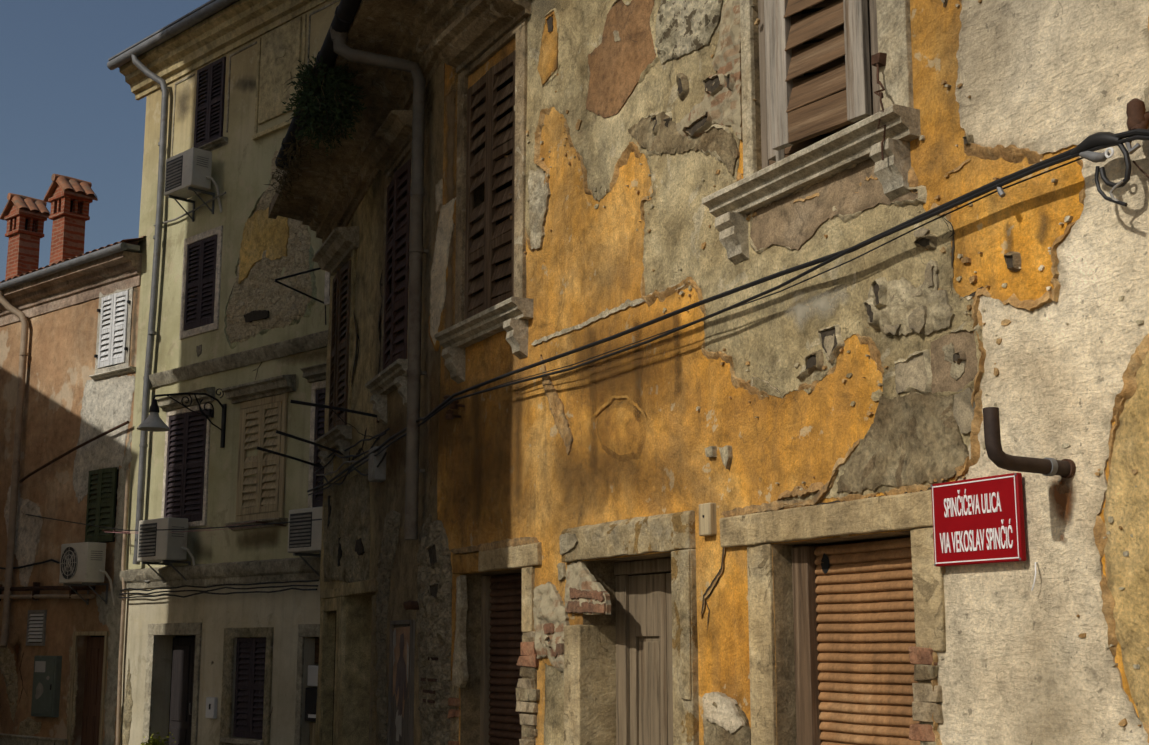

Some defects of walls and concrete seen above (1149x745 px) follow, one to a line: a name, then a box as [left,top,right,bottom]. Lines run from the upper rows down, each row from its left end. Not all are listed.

flaking render [224,148,317,349]
flaking render [509,0,1149,745]
flaking render [4,486,43,587]
flaking render [322,469,371,583]
rust [1050,479,1072,520]